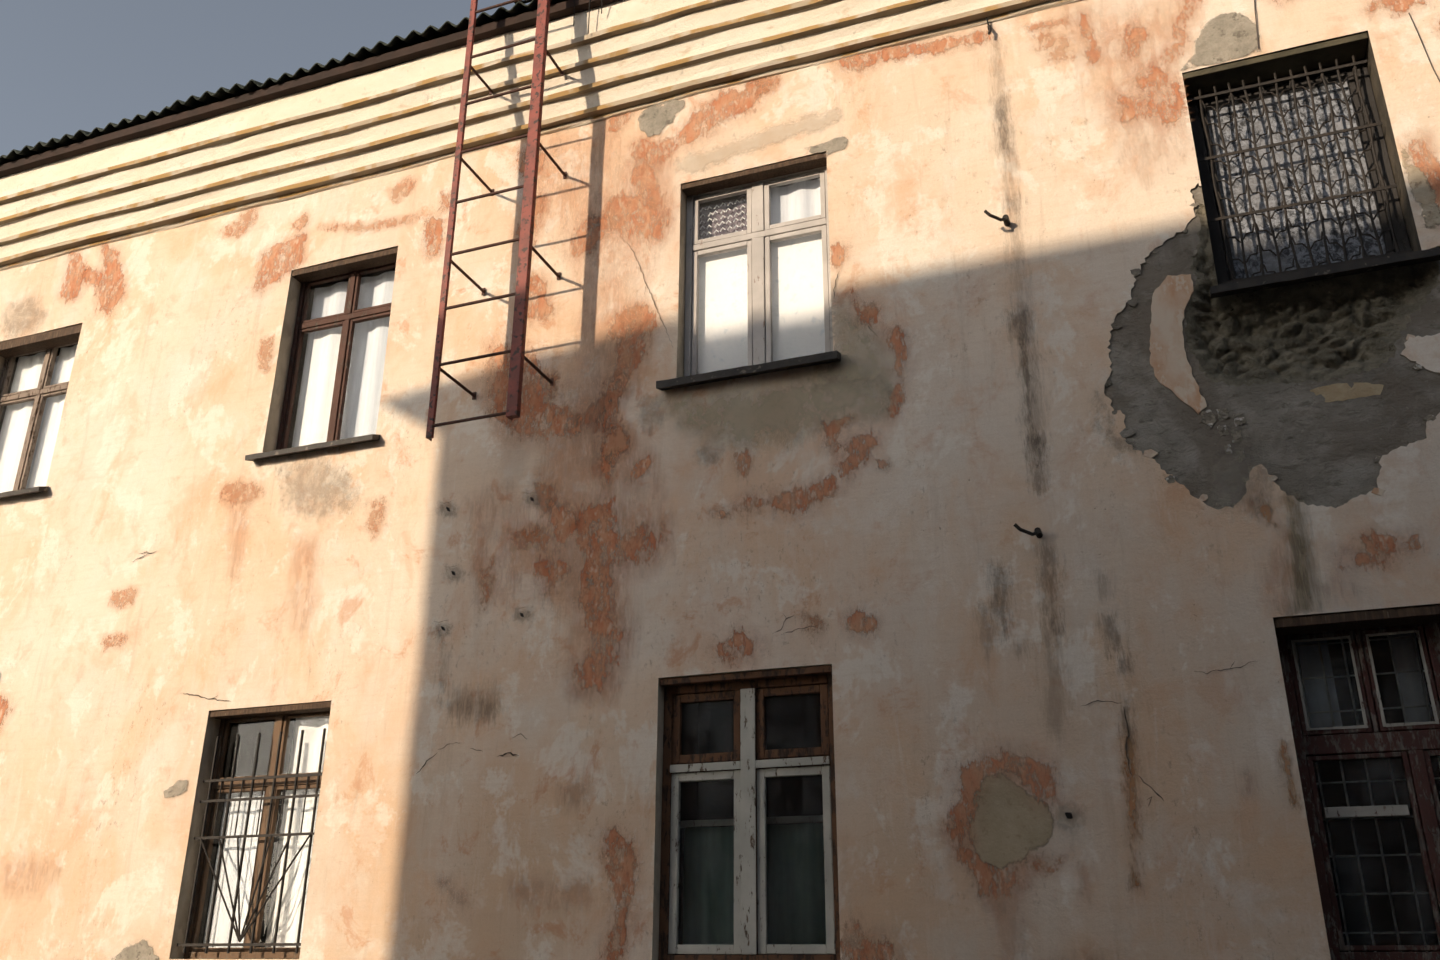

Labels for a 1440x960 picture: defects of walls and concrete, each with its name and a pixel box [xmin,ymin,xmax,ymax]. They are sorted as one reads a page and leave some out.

peeling [839,30,991,72]
peeling [1030,13,1102,64]
peeling [1117,0,1201,125]
peeling [571,75,779,257]
flaking render [1401,139,1440,228]
flaking render [1101,184,1440,510]
peeling [485,305,663,693]
peeling [946,751,1062,900]